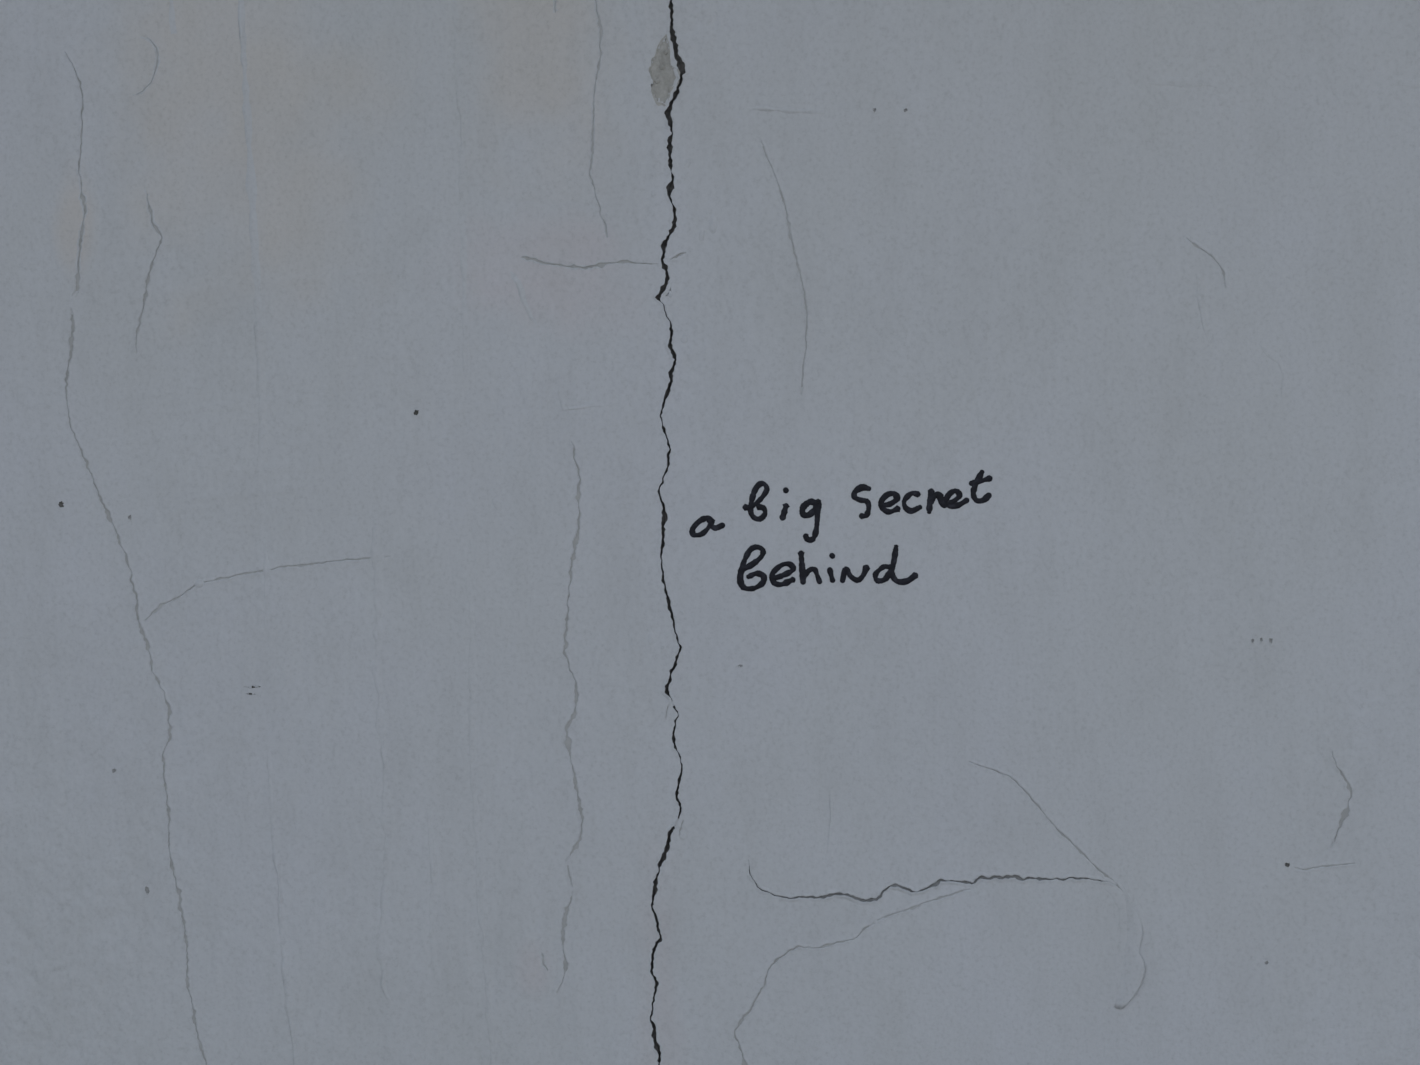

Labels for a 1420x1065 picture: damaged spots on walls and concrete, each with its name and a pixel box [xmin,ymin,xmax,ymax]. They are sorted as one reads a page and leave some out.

crack [62,50,391,1065]
crack [521,0,693,1065]
spalling [649,34,680,110]
crack [731,759,1124,1065]